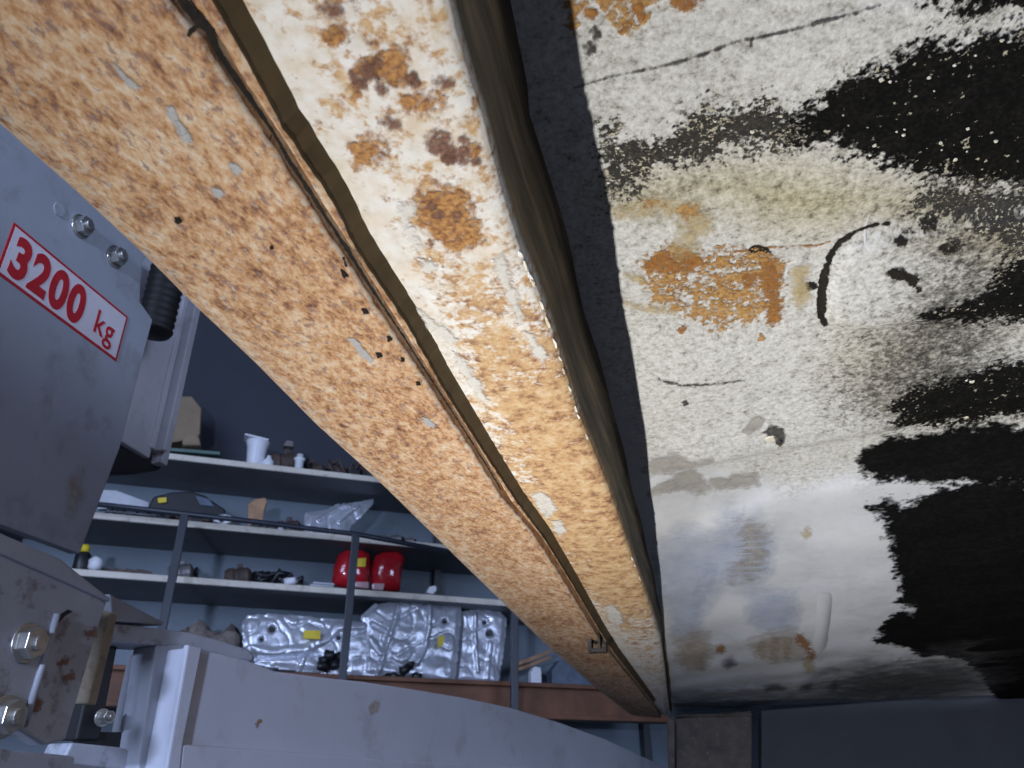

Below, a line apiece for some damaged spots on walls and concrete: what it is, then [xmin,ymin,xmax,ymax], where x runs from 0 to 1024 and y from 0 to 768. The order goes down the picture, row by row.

rust [563,0,704,37]
crack [574,5,880,88]
rust [346,45,454,167]
rust [426,129,482,166]
rust [412,181,486,258]
rust [610,199,810,341]
crack [734,221,890,327]